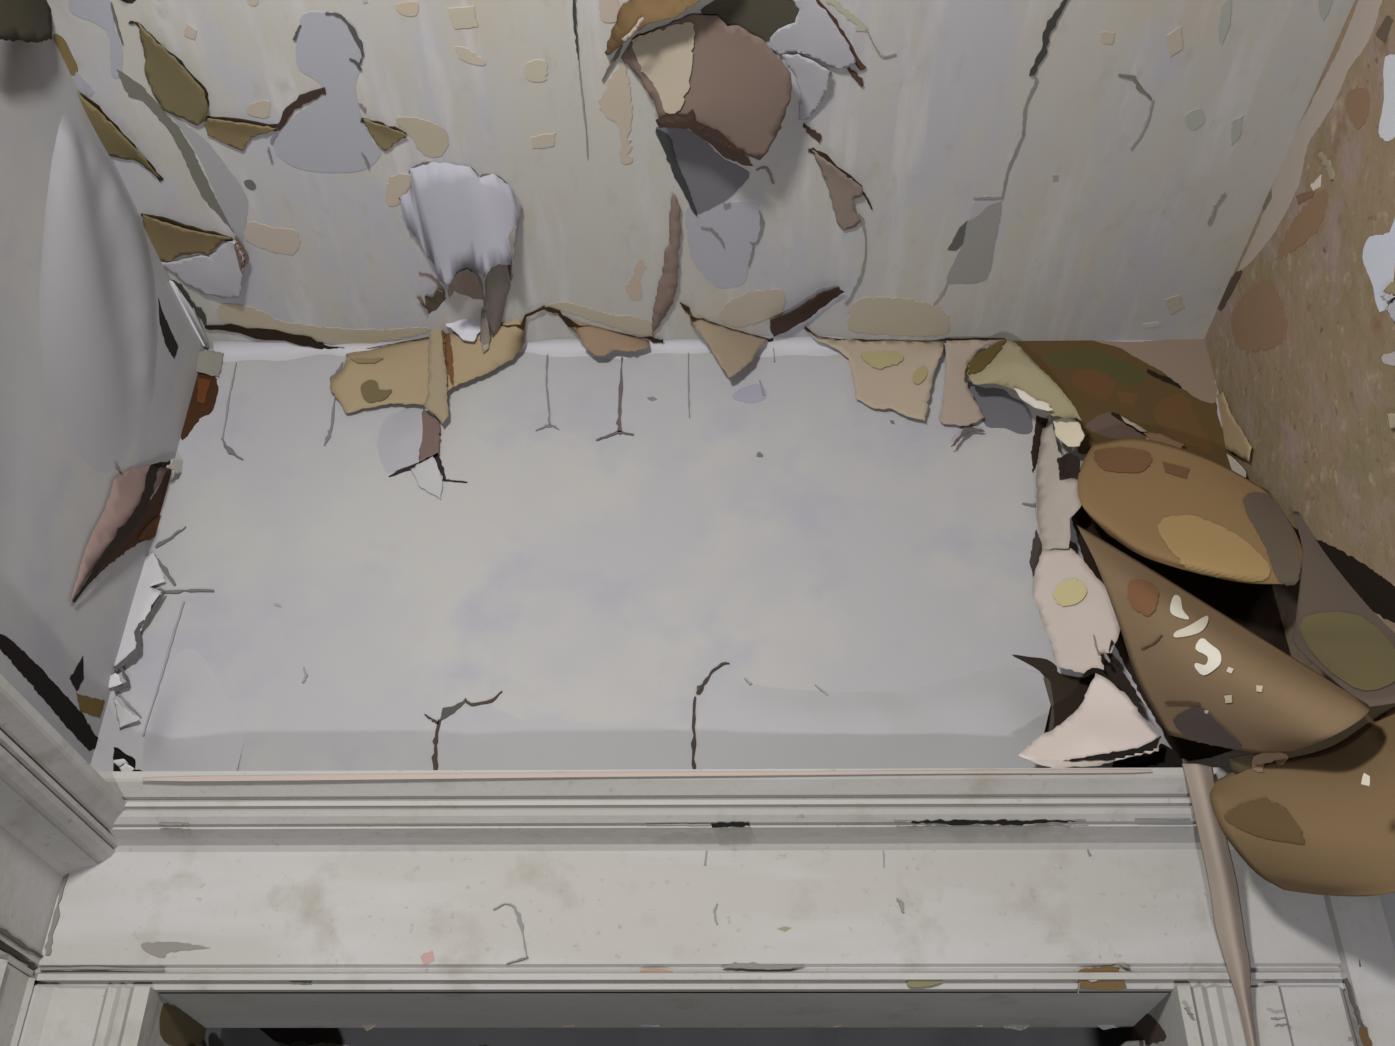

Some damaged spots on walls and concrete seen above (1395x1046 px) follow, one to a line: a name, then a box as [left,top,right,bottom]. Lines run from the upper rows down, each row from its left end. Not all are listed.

peeling [53,34,160,178]
peeling [116,11,406,440]
crack [573,0,623,158]
crack [974,0,1068,199]
crack [1118,73,1153,150]
flaking render [1217,0,1393,310]
peeling [70,463,172,666]
crack [70,461,214,737]
peeling [330,0,1291,1046]
flaking render [1293,527,1395,623]
crack [424,691,502,770]
crack [691,662,752,769]